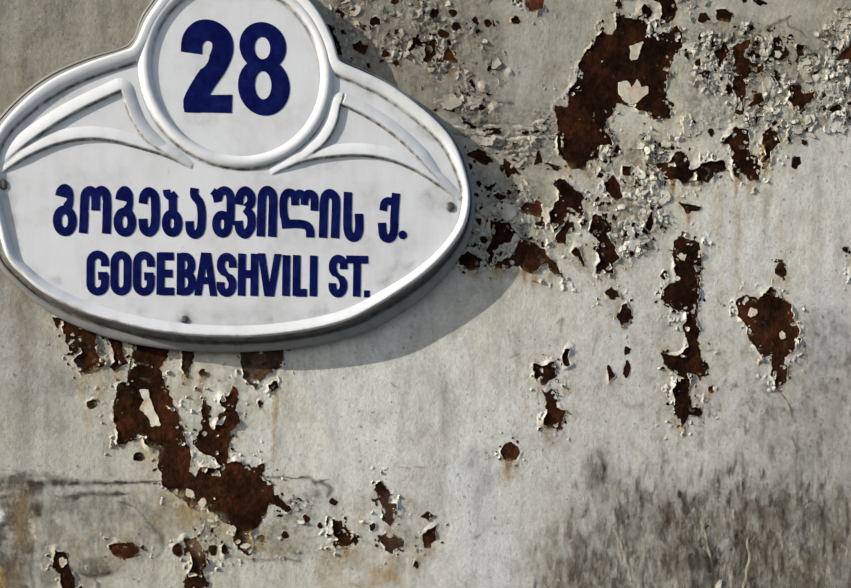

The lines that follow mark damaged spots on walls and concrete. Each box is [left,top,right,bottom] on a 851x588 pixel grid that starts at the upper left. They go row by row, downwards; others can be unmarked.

peeling [328,0,557,168]
peeling [674,4,851,147]
peeling [469,171,545,264]
rust [453,0,851,444]
rust [38,313,302,588]
rust [317,467,449,574]
rust [486,428,534,477]